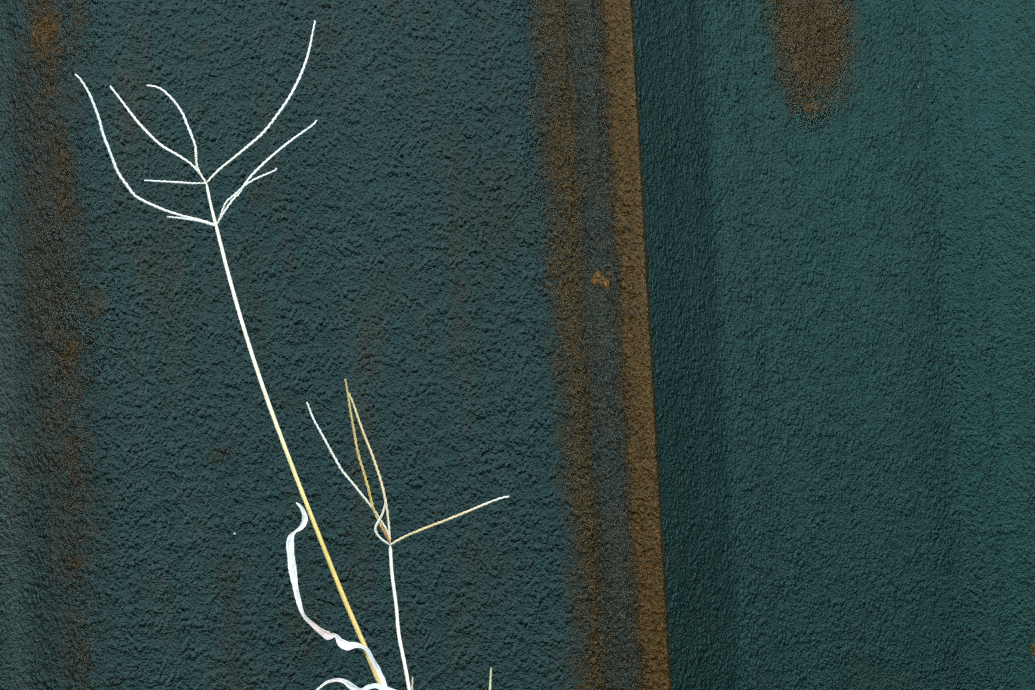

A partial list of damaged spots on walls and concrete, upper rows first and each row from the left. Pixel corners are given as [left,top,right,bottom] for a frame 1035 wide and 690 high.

rust [591,0,671,690]